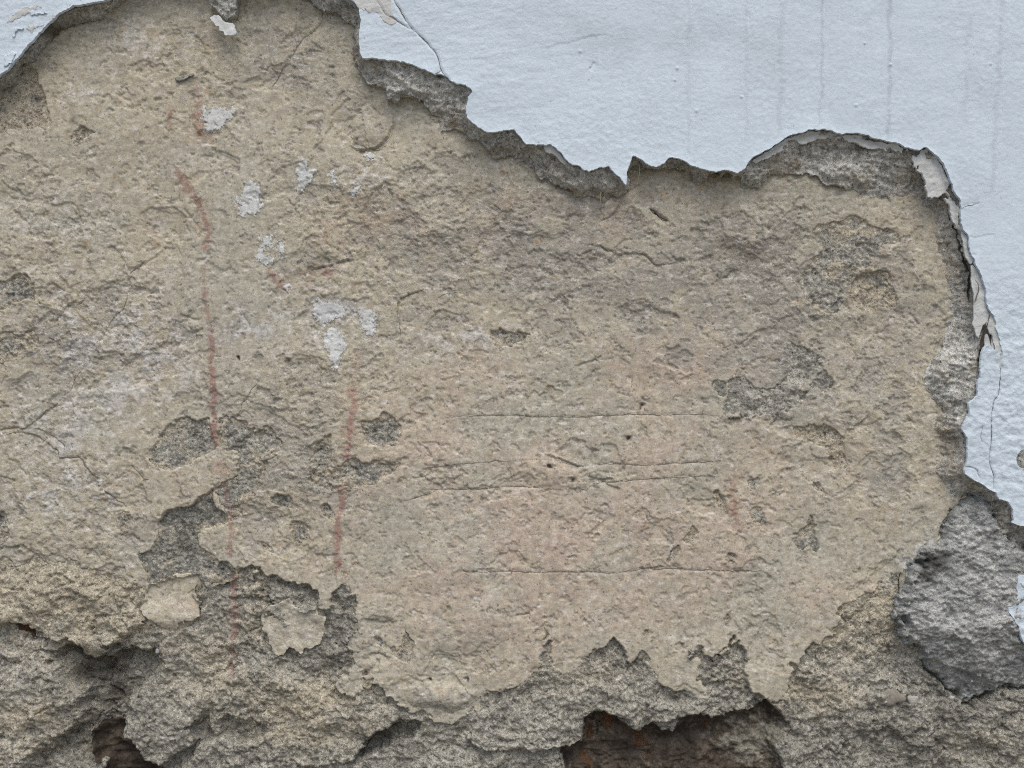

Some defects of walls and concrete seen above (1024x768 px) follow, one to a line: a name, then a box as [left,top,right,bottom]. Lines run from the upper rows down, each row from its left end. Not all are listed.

spalling [0,0,127,135]
spalling [71,127,94,147]
spalling [0,274,36,313]
spalling [0,330,40,364]
spalling [303,0,1024,554]
spalling [0,415,1024,768]